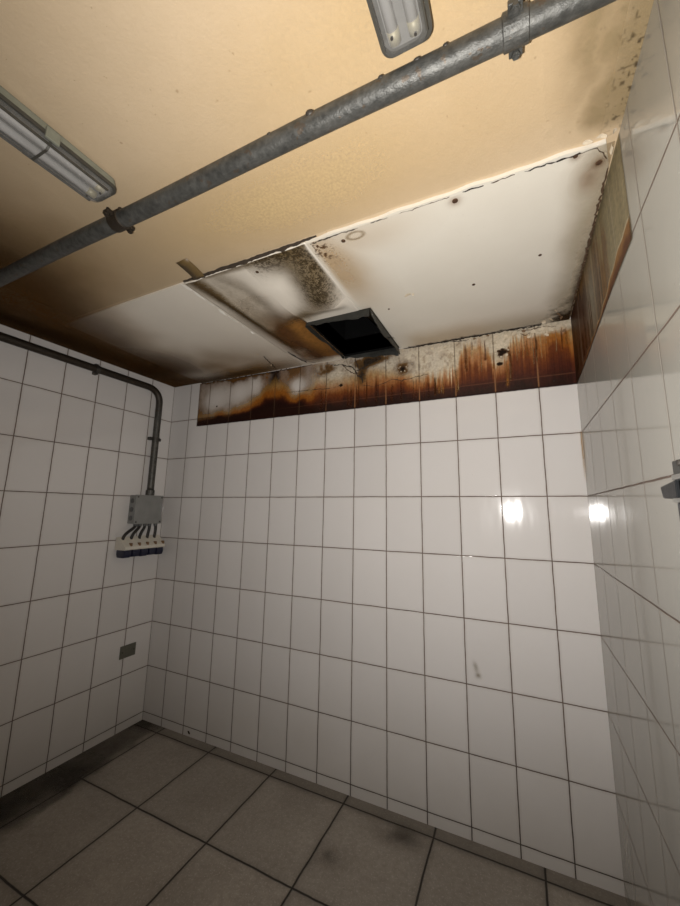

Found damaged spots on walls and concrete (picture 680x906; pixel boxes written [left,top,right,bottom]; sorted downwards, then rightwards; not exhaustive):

mould [603,0,654,120]
damp [251,242,353,306]
corrosion [197,134,632,426]
crack [310,148,608,349]